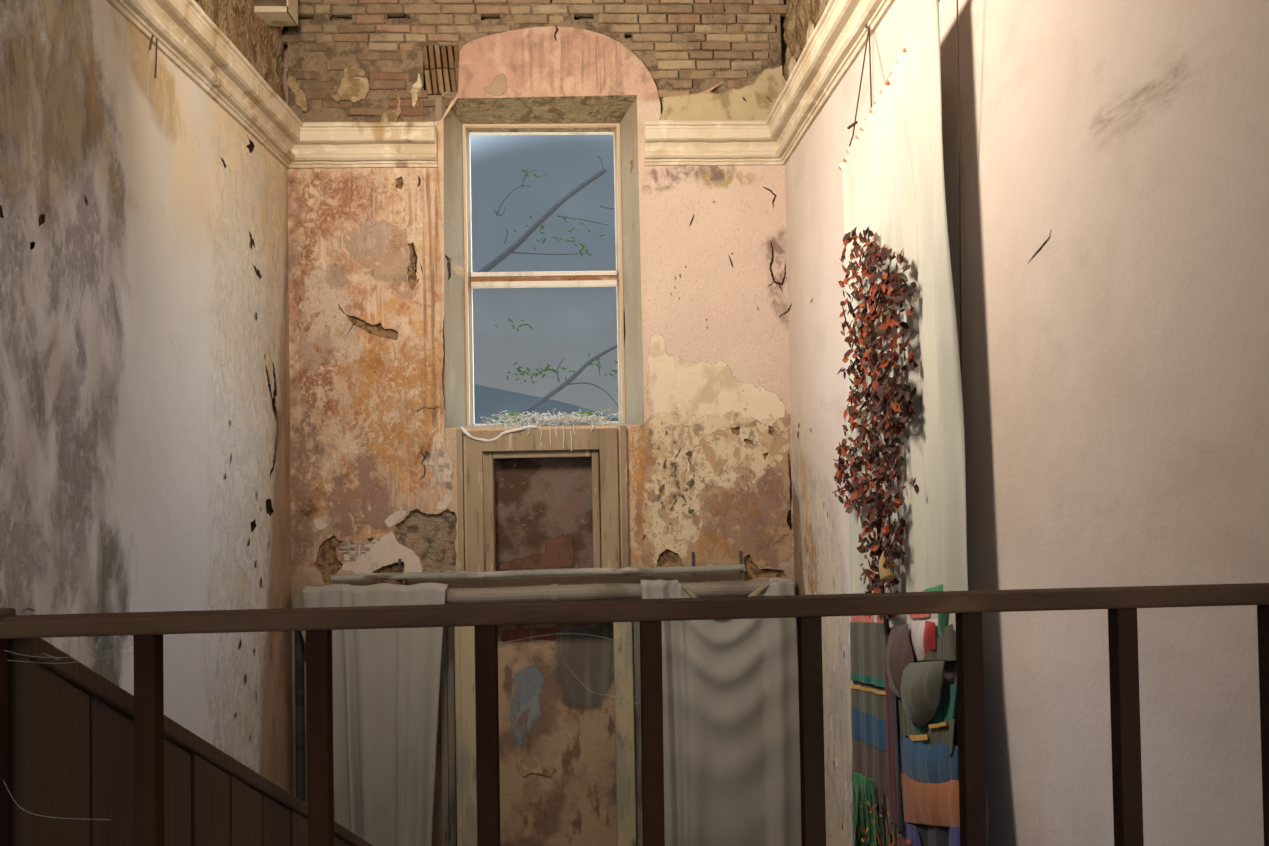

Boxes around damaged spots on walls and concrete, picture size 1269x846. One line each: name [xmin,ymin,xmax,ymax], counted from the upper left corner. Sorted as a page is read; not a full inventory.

flaking render [195,0,829,122]
water stain [0,0,127,615]
peeling [298,220,417,377]
crack [768,241,813,317]
flaking render [314,449,457,585]
peeling [647,334,792,581]
water stain [42,636,123,687]